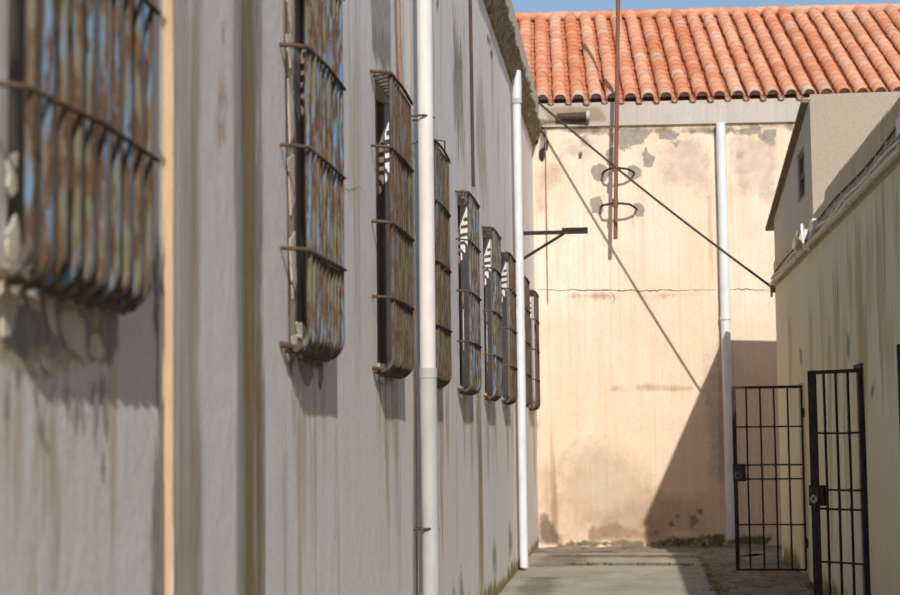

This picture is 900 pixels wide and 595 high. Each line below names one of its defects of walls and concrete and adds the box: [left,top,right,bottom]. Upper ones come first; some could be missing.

peeling [609,128,680,151]
peeling [0,281,119,454]
damp [541,516,558,543]